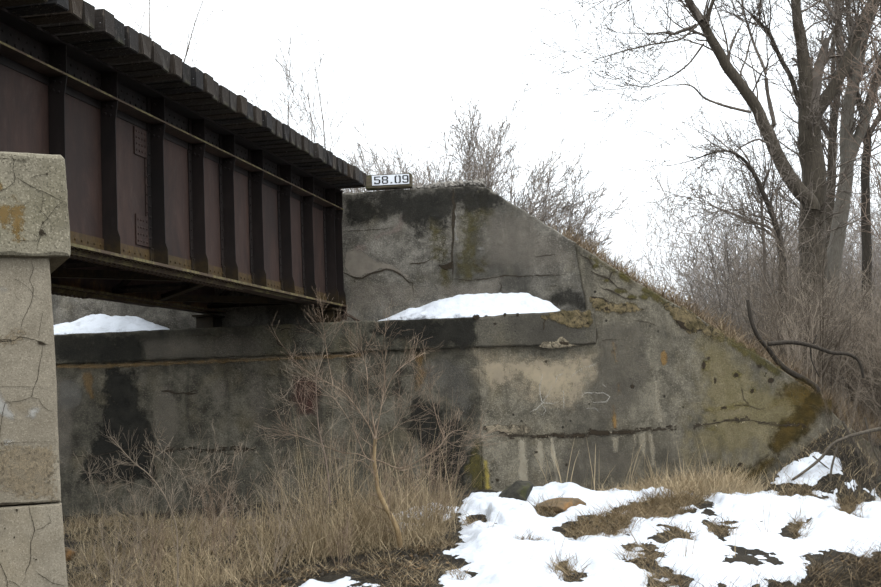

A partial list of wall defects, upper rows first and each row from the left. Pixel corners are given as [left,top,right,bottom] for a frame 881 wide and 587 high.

corrosion [0,201,25,243]
crack [1,157,66,246]
damp [346,182,503,236]
crack [343,188,566,291]
crack [581,254,658,327]
crack [0,266,57,444]
crack [0,509,66,587]